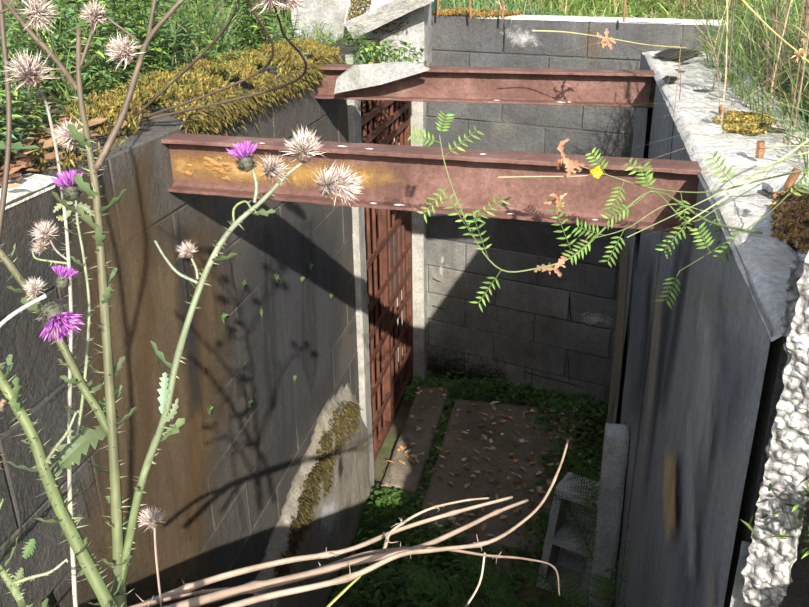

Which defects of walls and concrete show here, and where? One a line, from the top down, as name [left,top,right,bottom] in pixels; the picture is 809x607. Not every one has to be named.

rust [174,156,390,186]
rust [663,453,675,539]
leakage [320,497,339,535]